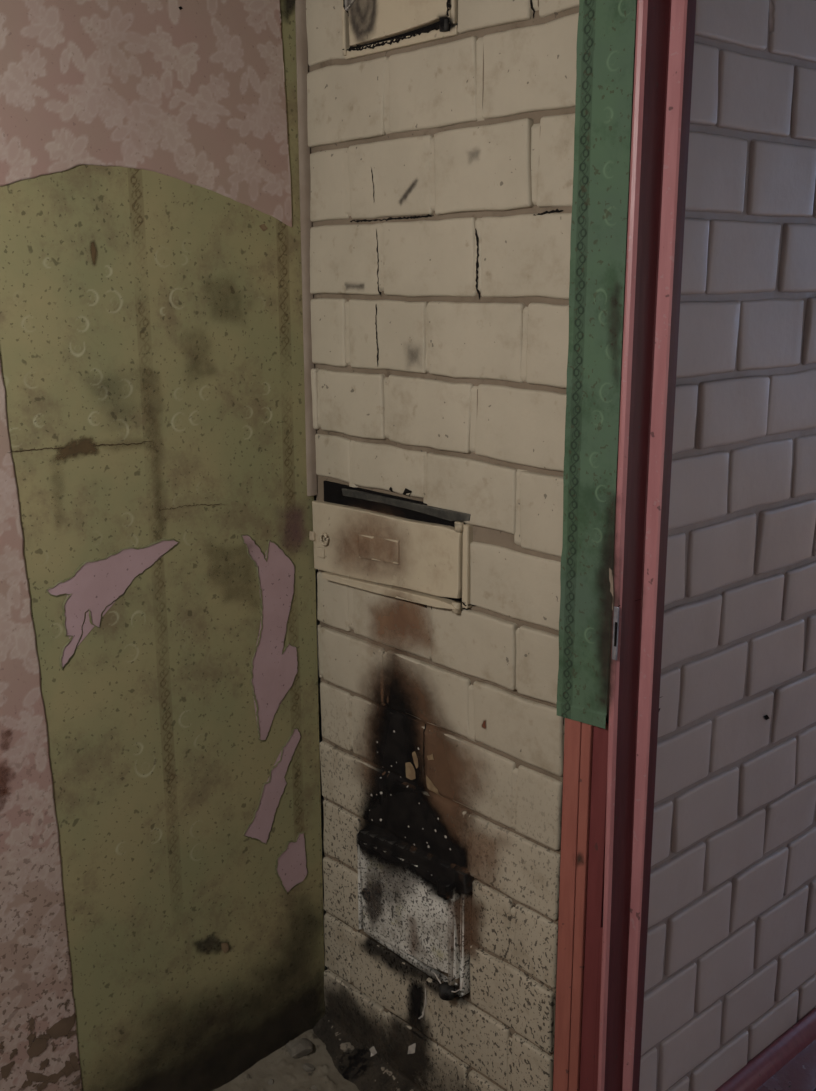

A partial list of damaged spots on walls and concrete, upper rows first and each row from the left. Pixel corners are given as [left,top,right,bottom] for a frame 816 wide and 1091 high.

crack [473,229,481,299]